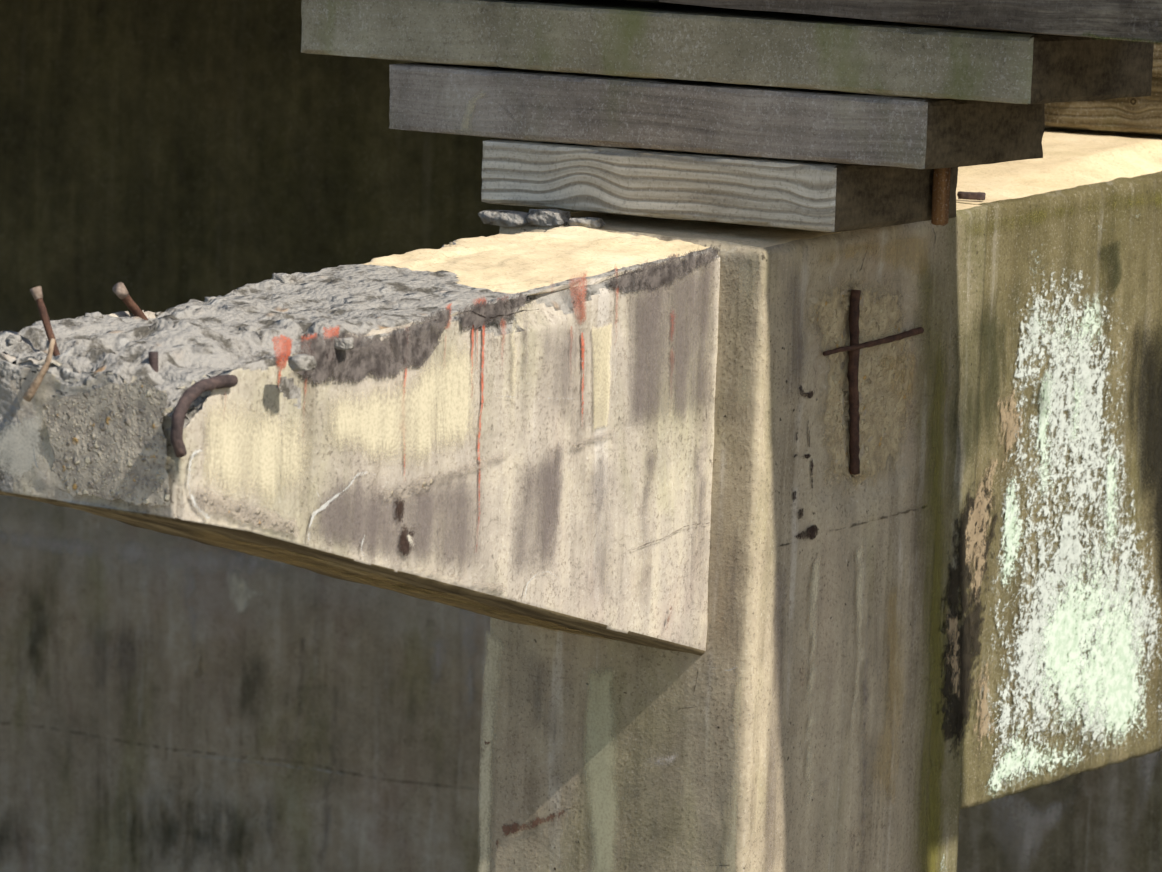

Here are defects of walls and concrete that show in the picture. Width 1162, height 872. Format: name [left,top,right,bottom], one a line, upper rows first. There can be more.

spalling [7,335,22,345]
spalling [23,339,238,506]
spalling [270,273,296,284]
rust [471,324,485,525]
rust [570,274,586,420]
peeling [937,389,1023,759]
water stain [988,243,1162,793]